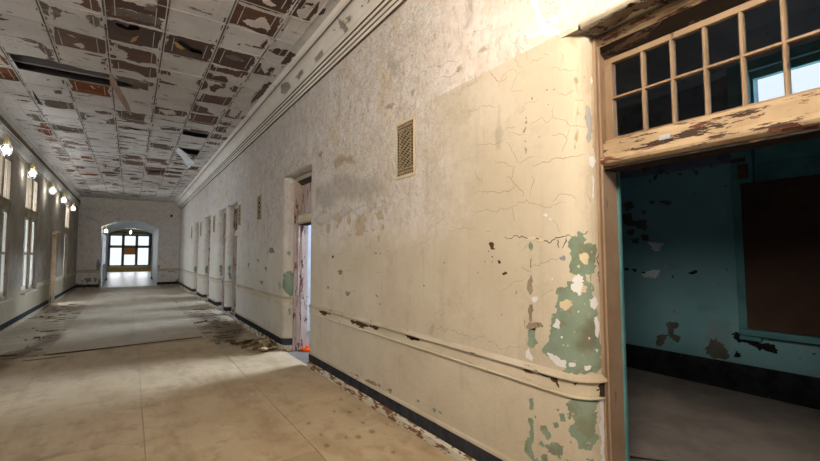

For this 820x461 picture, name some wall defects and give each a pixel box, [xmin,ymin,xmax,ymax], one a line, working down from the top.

peeling [579,0,671,36]
peeling [0,55,21,81]
peeling [13,0,326,199]
crack [419,25,588,290]
spalling [326,211,385,242]
peeling [622,200,671,251]
peeling [282,271,293,296]
peeling [523,231,602,388]
spalling [656,322,681,346]
spalling [705,332,778,360]
peeling [524,383,605,461]